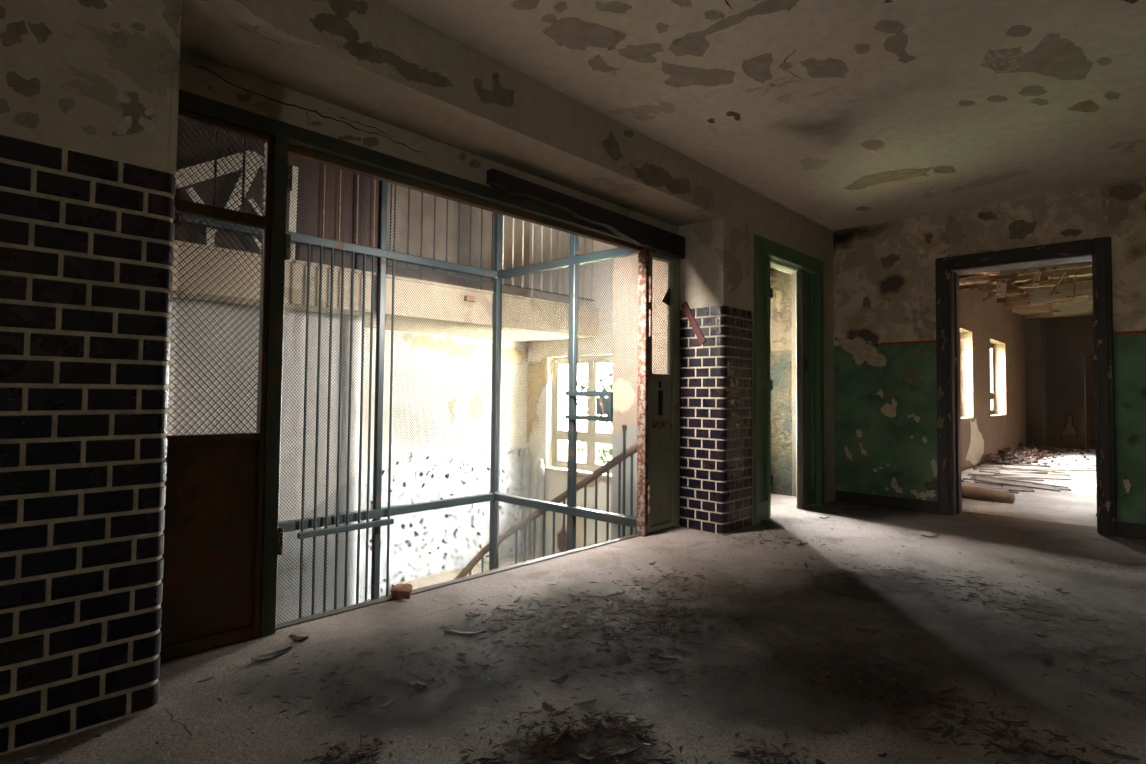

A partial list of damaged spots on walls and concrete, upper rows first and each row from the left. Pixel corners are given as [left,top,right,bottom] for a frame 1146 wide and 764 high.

flaking render [310,0,514,108]
peeling [511,0,849,88]
peeling [874,21,916,63]
peeling [959,25,1112,106]
crack [196,65,427,154]
peeling [844,166,957,190]
spalling [835,335,887,367]
peeling [876,390,923,423]
spalling [964,419,984,466]
peeling [873,458,947,500]